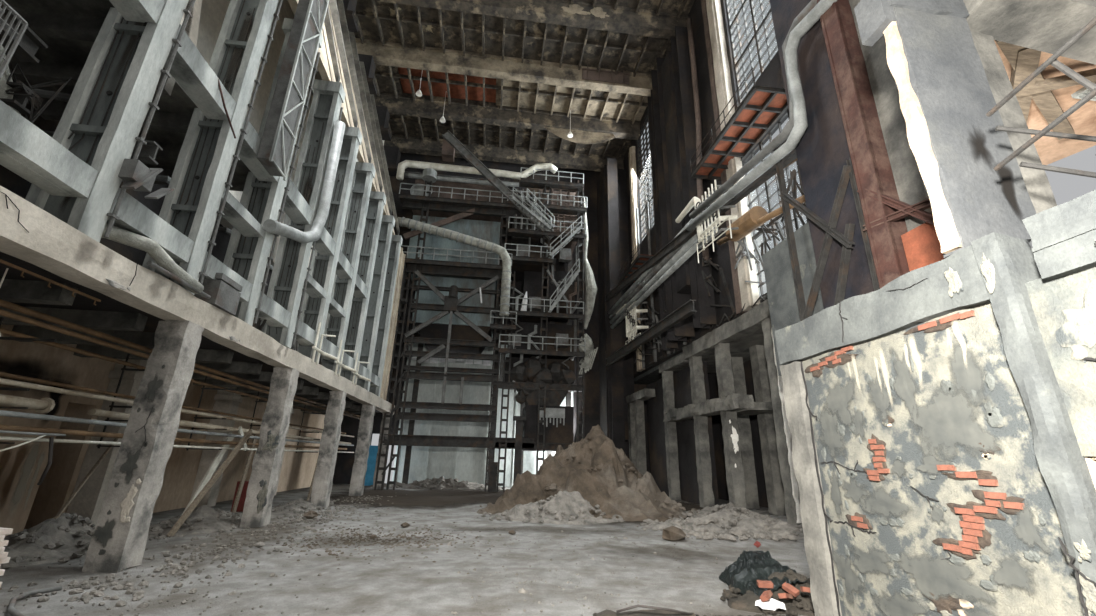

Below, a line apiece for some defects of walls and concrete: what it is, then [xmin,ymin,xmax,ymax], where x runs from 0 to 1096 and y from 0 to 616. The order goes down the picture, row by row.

flaking render [805,346,858,377]
damp [875,352,891,397]
damp [905,339,922,380]
flaking render [904,310,976,334]
damp [947,324,966,358]
peeling [1055,279,1096,363]
flaking render [825,344,1051,616]